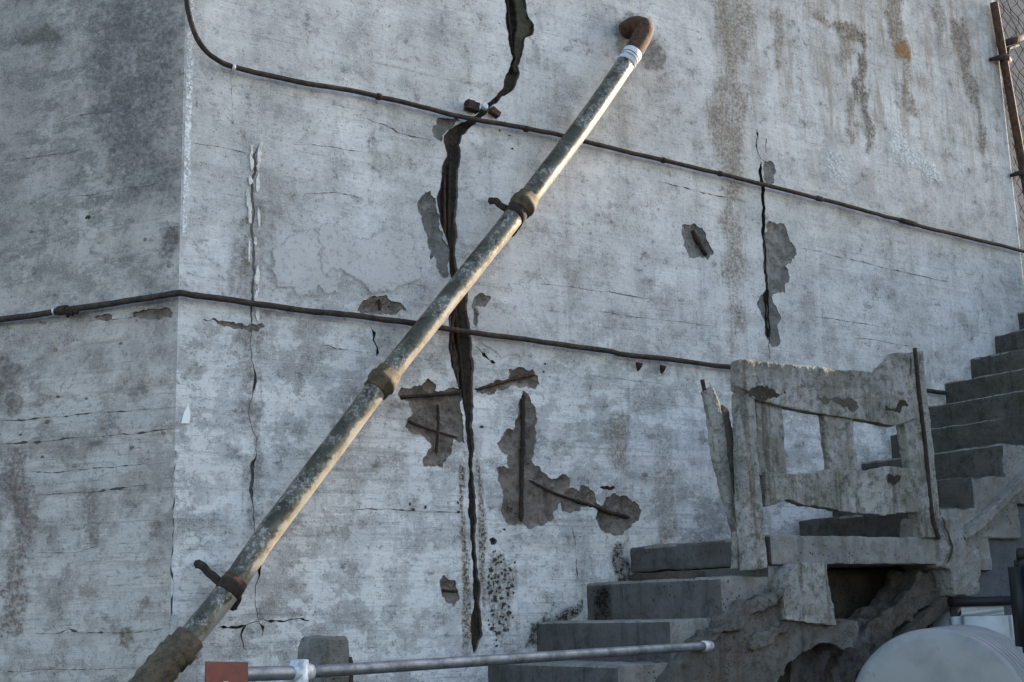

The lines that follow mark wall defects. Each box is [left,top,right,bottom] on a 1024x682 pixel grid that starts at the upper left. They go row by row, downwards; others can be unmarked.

water stain [852,34,875,151]
corrosion [886,0,918,117]
water stain [951,19,987,150]
spalling [417,190,450,278]
spalling [681,223,714,260]
crack [357,0,534,653]
crack [248,328,257,532]
spalling [398,378,465,467]
spalling [475,363,642,536]
crack [2,407,176,634]
crack [218,566,310,647]
spalling [440,575,460,606]